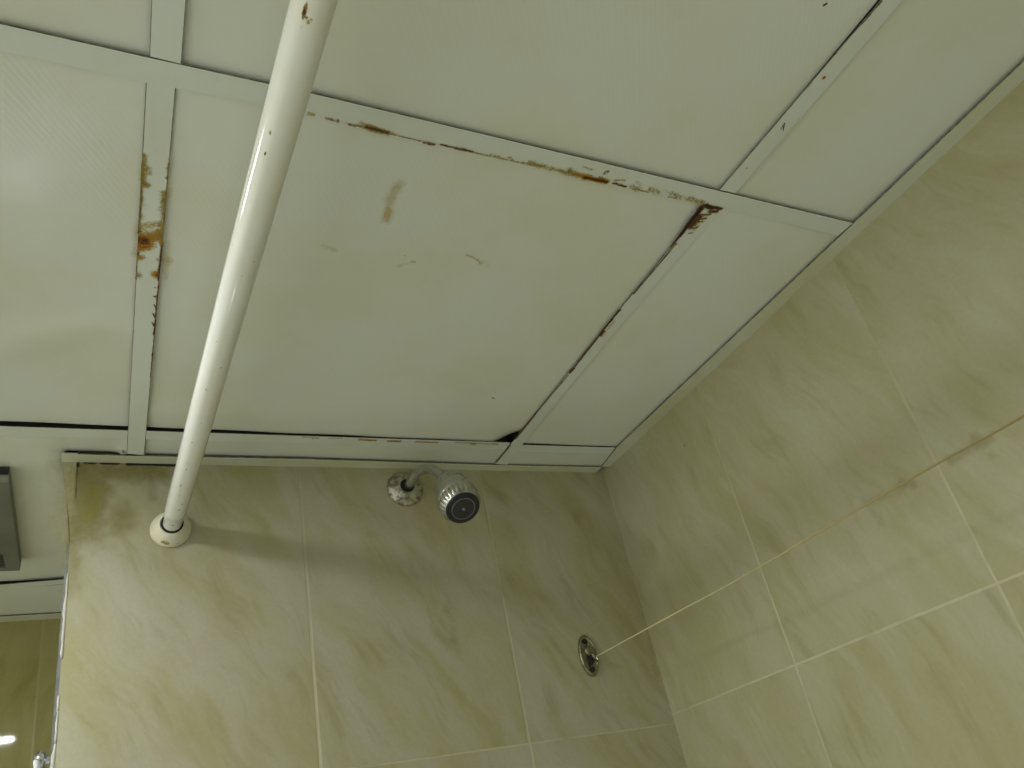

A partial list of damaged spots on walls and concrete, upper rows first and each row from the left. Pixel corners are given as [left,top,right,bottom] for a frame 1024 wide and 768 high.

corrosion [135,154,170,378]
corrosion [308,112,723,294]
corrosion [455,309,621,463]